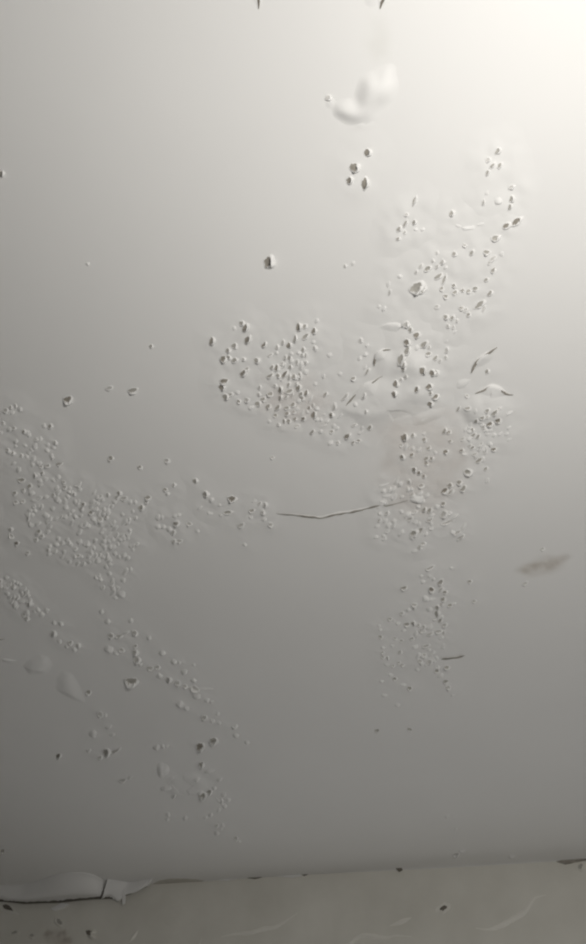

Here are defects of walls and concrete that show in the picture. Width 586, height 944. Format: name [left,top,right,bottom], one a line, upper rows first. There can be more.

crack [276,500,408,519]
crack [441,653,465,661]
peeling [0,872,205,915]